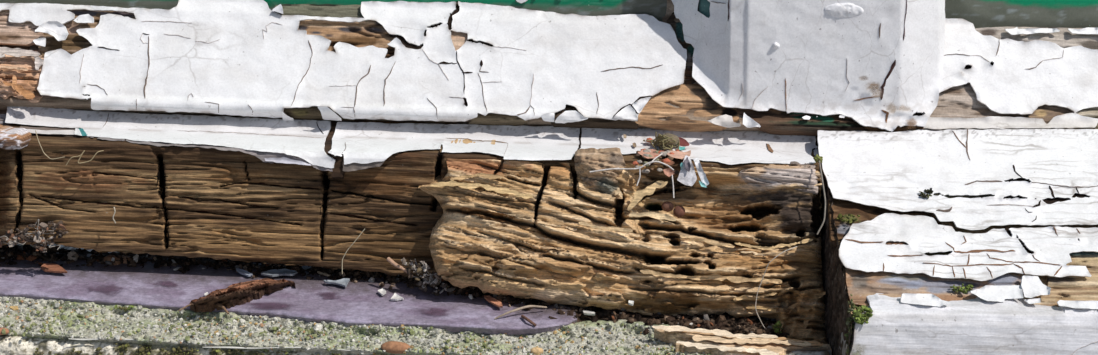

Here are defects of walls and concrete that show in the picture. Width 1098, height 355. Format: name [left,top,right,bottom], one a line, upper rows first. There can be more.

peeling [0,10,136,57]
crack [14,1,535,258]
peeling [282,106,355,179]
peeling [468,113,528,126]
crack [534,65,661,227]
peeling [541,12,877,137]
crack [845,0,925,132]
crack [944,42,1000,69]
peeling [930,83,1098,129]
peeling [828,198,942,241]
crack [846,129,1098,278]
peeling [844,255,1098,310]